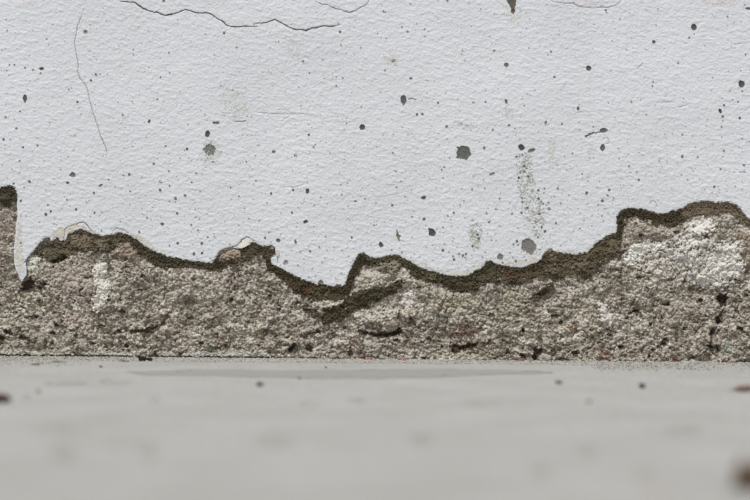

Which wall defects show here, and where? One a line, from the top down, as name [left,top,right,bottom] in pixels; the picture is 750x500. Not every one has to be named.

crack [120,0,369,31]
crack [74,11,107,151]
peeling [521,238,553,255]